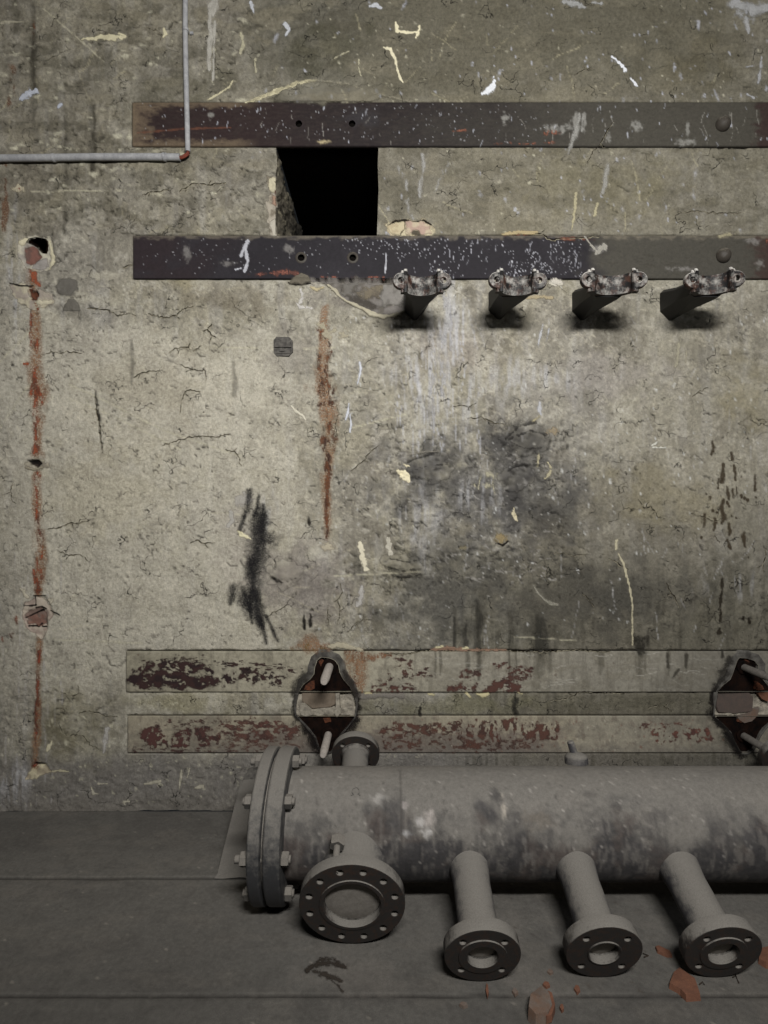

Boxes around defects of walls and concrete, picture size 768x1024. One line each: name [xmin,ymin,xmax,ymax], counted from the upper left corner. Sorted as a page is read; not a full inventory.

flaking render [18,235,56,272]
flaking render [385,218,435,236]
corrosion [23,269,50,456]
crack [87,306,242,466]
corrosion [315,305,338,539]
corrosion [32,470,48,597]
crack [48,519,90,561]
flaking render [20,588,60,639]
crack [327,583,371,633]
corrosion [32,637,43,769]